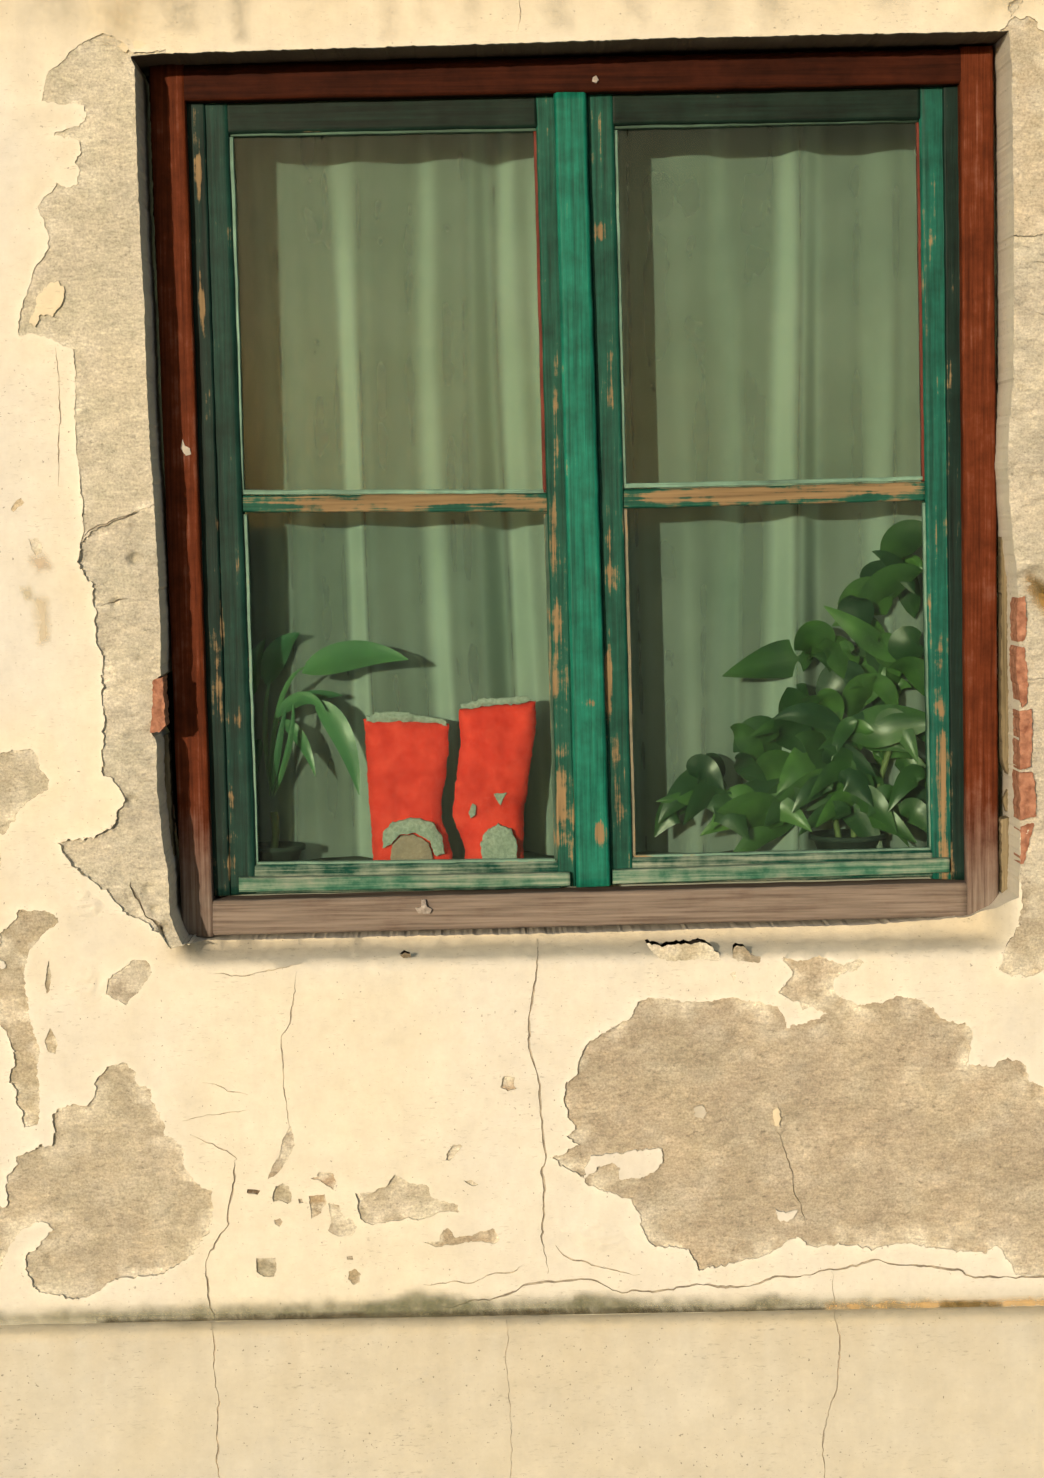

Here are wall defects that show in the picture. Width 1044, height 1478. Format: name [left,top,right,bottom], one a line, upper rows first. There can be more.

peeling [18,33,191,948]
spalling [999,0,1044,977]
peeling [0,749,49,834]
spalling [0,909,214,1298]
crack [189,1084,244,1478]
crack [215,965,296,1123]
spalling [256,1258,277,1276]
spalling [347,1256,361,1284]
spalling [247,1126,499,1247]
spalling [647,942,761,963]
crack [424,939,1044,1478]
spalling [553,955,1044,1276]